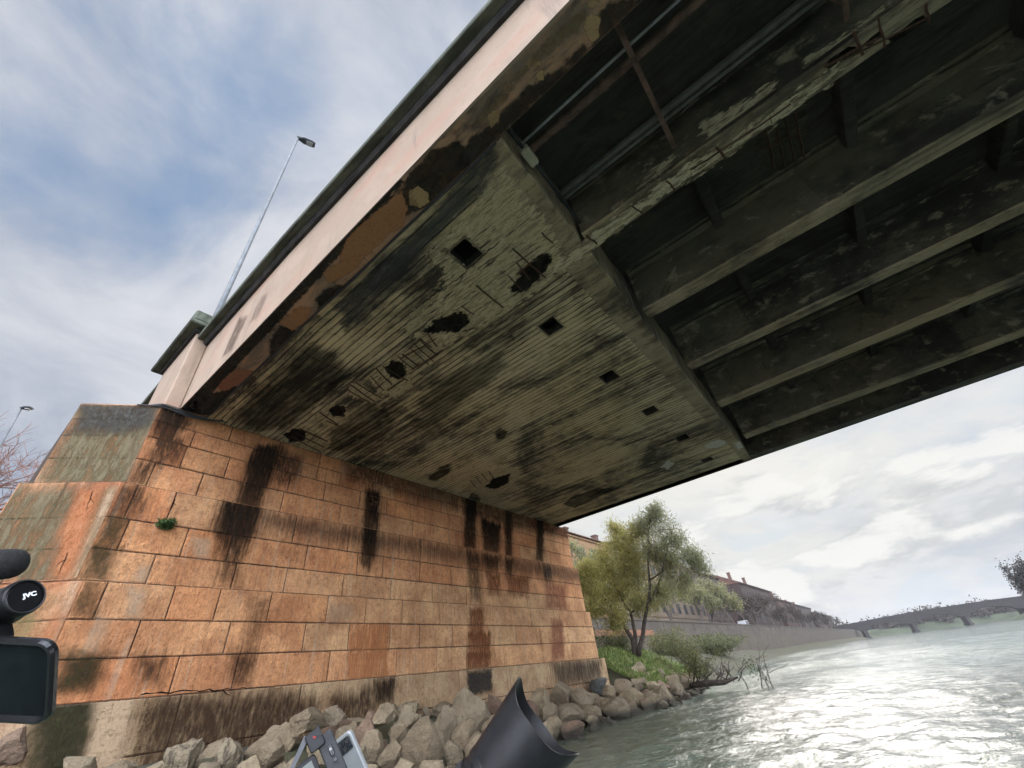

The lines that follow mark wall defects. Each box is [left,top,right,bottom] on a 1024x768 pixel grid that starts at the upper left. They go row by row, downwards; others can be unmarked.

spalling [279,0,931,452]
water stain [214,404,576,595]
spalling [467,467,522,503]
water stain [468,669,493,696]
water stain [552,660,601,684]